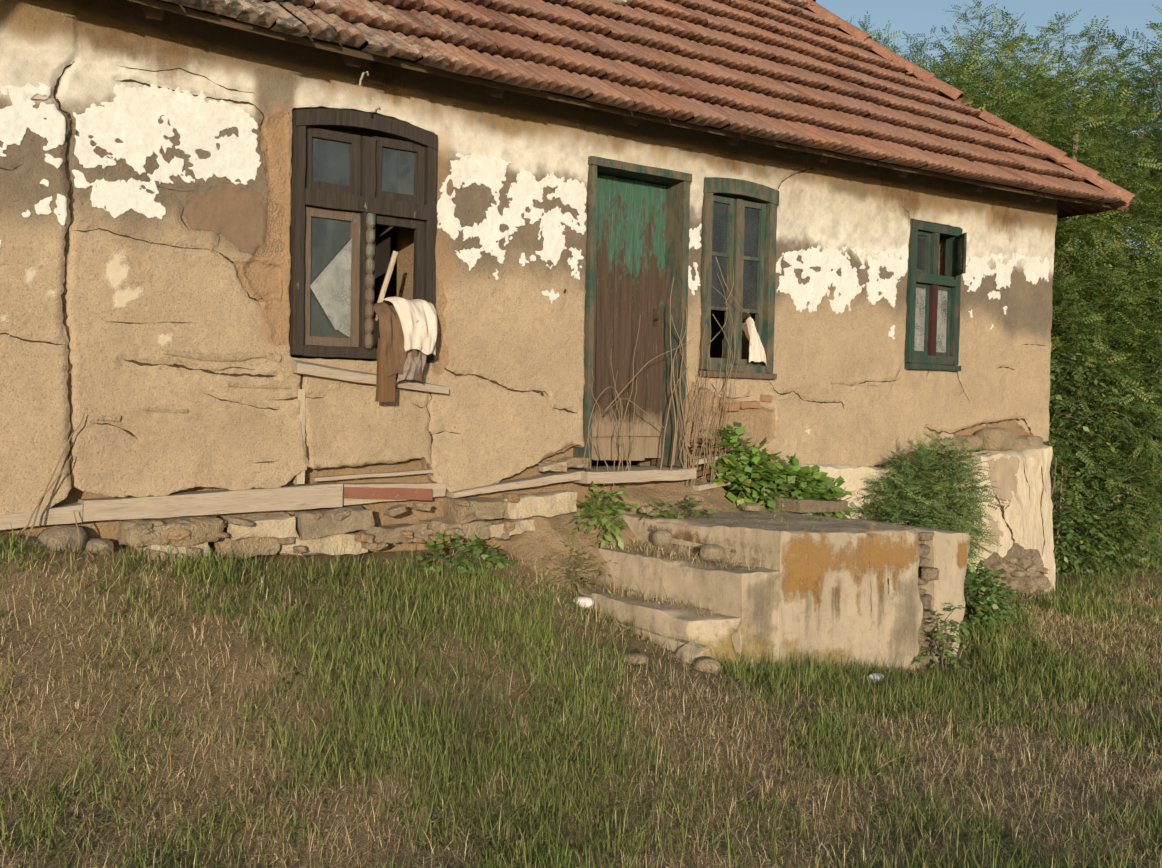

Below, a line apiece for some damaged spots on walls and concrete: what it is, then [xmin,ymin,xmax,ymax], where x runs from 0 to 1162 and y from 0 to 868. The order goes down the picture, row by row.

crack [0,61,268,490]
peeling [0,82,291,346]
peeling [436,153,587,304]
peeling [776,244,909,314]
peeling [962,252,1050,315]
crack [711,370,900,408]
crack [926,418,1046,555]